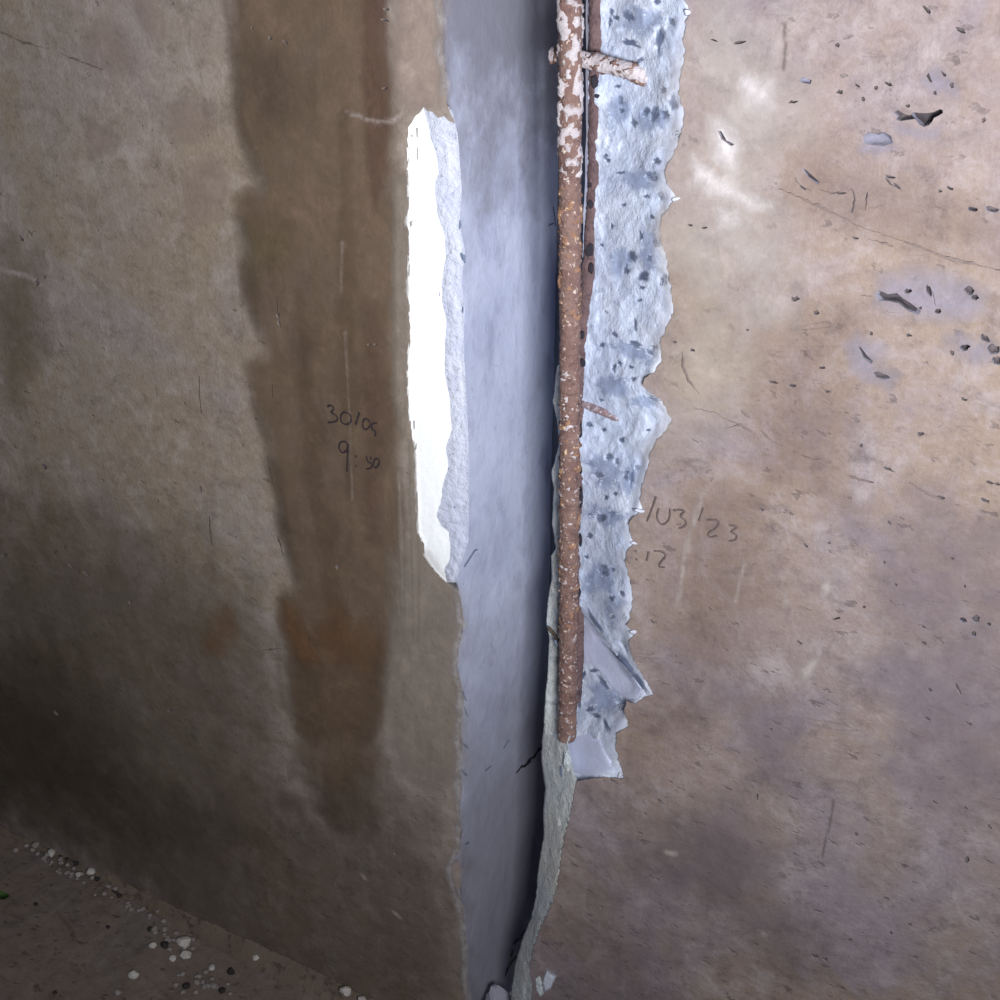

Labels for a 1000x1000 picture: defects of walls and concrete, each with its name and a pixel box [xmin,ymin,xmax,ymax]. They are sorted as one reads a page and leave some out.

leakage [235,0,456,824]
peeling [405,107,471,1000]
rust [585,243,594,274]
rust [590,74,600,98]
spalling [511,0,691,1000]
crack [779,178,1000,271]